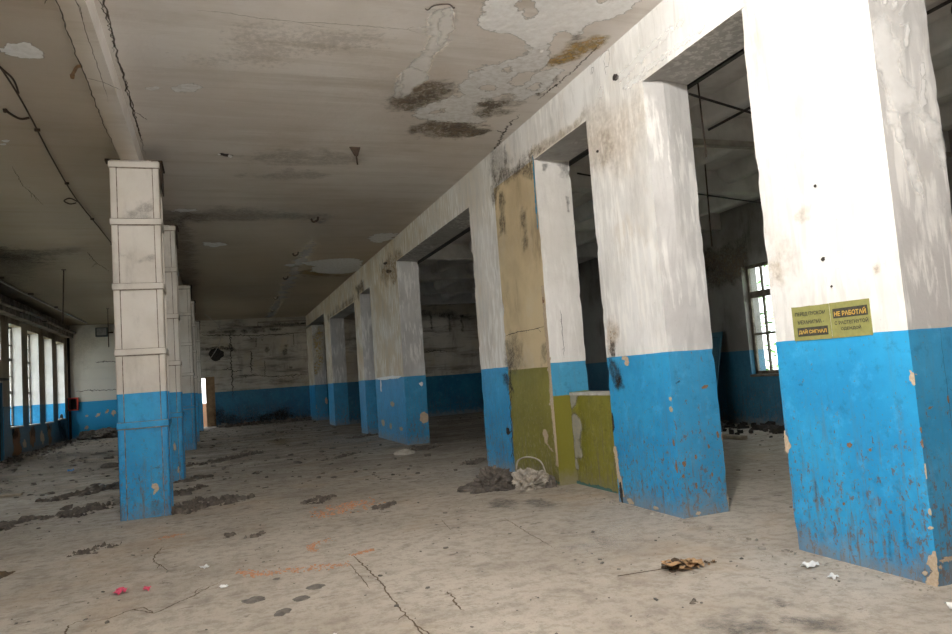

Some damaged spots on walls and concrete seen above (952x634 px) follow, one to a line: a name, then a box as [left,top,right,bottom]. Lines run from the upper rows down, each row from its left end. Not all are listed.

peeling [0,42,44,59]
leakage [393,8,454,111]
peeling [412,0,641,124]
leakage [411,120,490,137]
leakage [477,100,509,117]
peeling [570,395,634,505]
spalling [922,551,952,587]
crack [64,585,213,634]
crack [348,556,429,634]